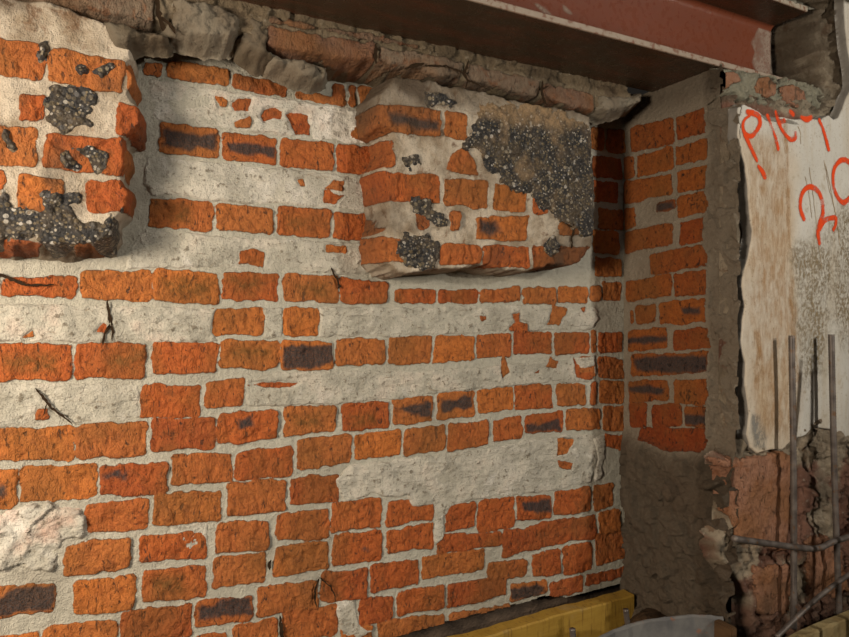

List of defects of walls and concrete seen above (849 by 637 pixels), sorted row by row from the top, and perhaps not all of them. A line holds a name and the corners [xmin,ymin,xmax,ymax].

crack [0,273,54,286]
crack [102,300,115,345]
leakage [792,210,849,377]
crack [35,388,73,425]
spalling [731,334,849,637]
spalling [0,500,89,573]